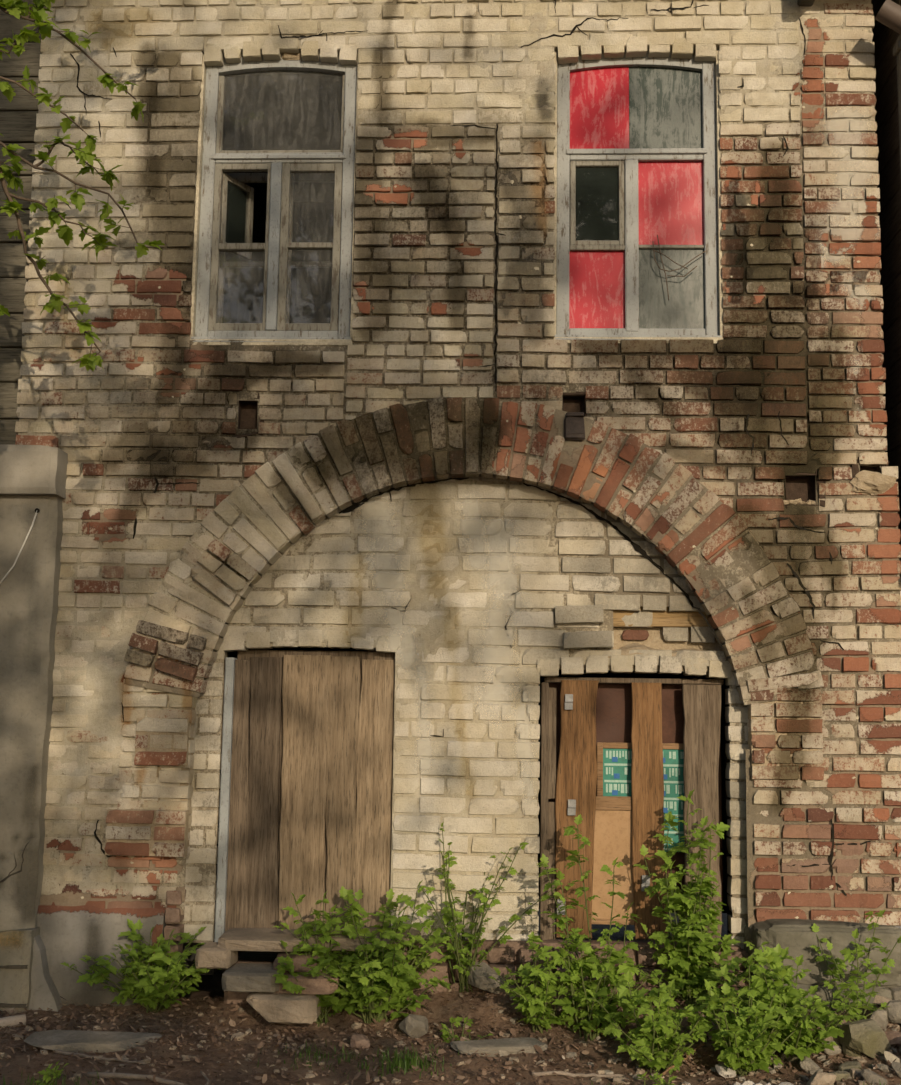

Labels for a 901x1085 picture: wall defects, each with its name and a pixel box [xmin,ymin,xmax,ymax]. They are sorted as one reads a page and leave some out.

crack [521,0,704,48]
peeling [792,18,850,128]
peeling [92,317,119,330]
peeling [113,267,187,329]
peeling [122,356,144,370]
peeling [156,342,216,398]
spalling [81,507,138,543]
peeling [822,647,901,754]
crack [0,841,30,883]
spalling [46,837,81,862]
spalling [748,770,901,927]
spalling [37,856,185,955]